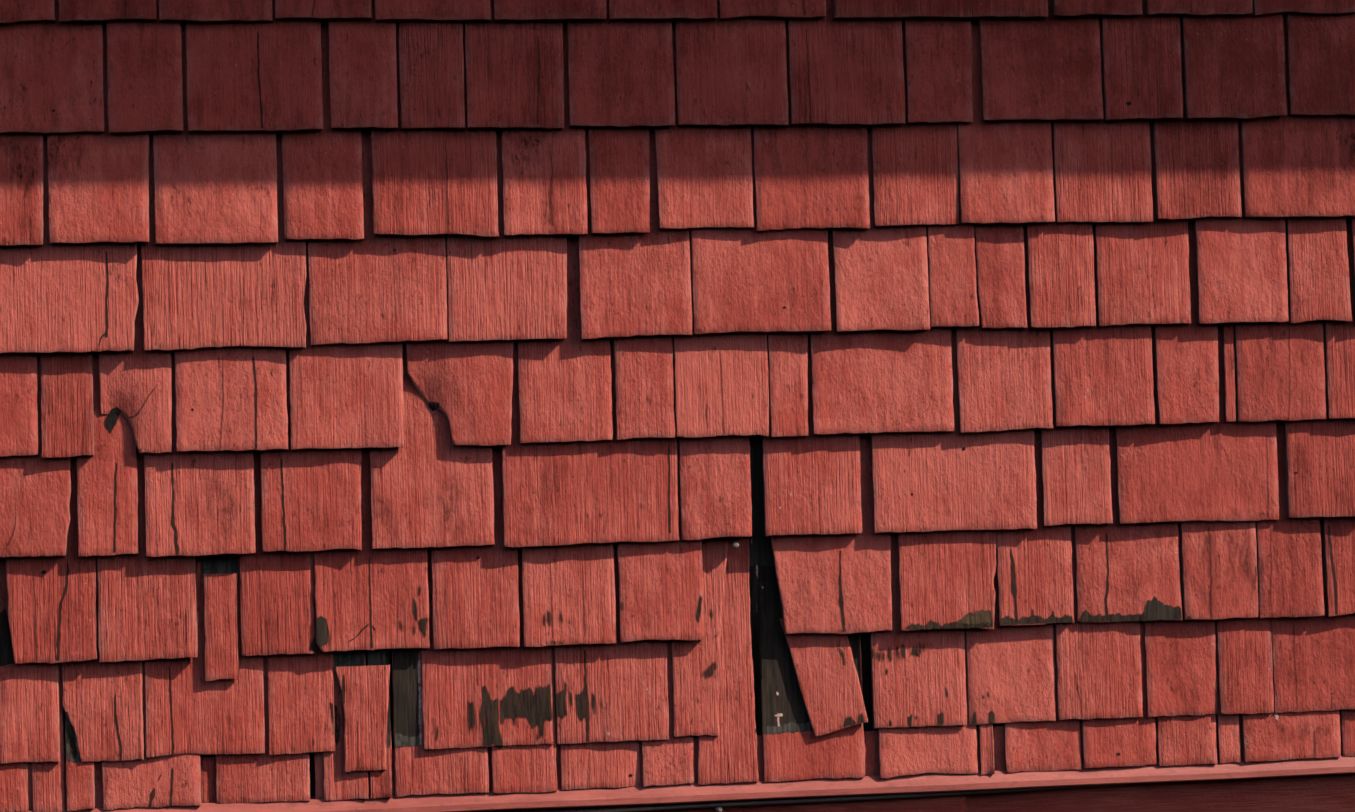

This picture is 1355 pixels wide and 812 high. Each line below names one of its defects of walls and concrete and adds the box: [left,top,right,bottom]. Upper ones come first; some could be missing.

crack [99,252,109,345]
crack [113,384,158,552]
crack [171,463,179,554]
peeling [0,609,15,666]
peeling [309,587,438,747]
peeling [467,682,607,748]
peeling [750,566,813,734]
peeling [839,596,1192,727]